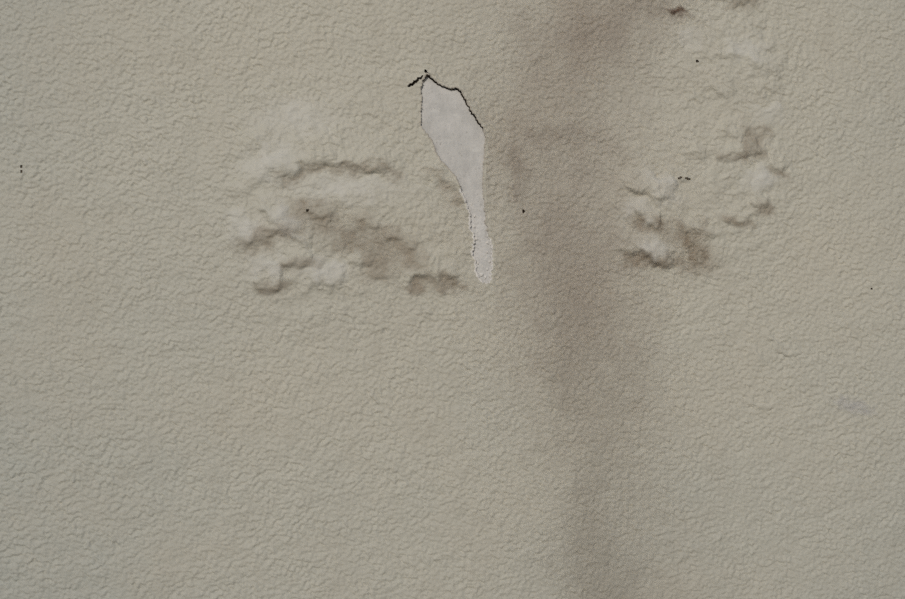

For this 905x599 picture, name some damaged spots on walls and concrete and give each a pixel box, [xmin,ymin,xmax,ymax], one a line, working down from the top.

peeling [419,73,493,284]